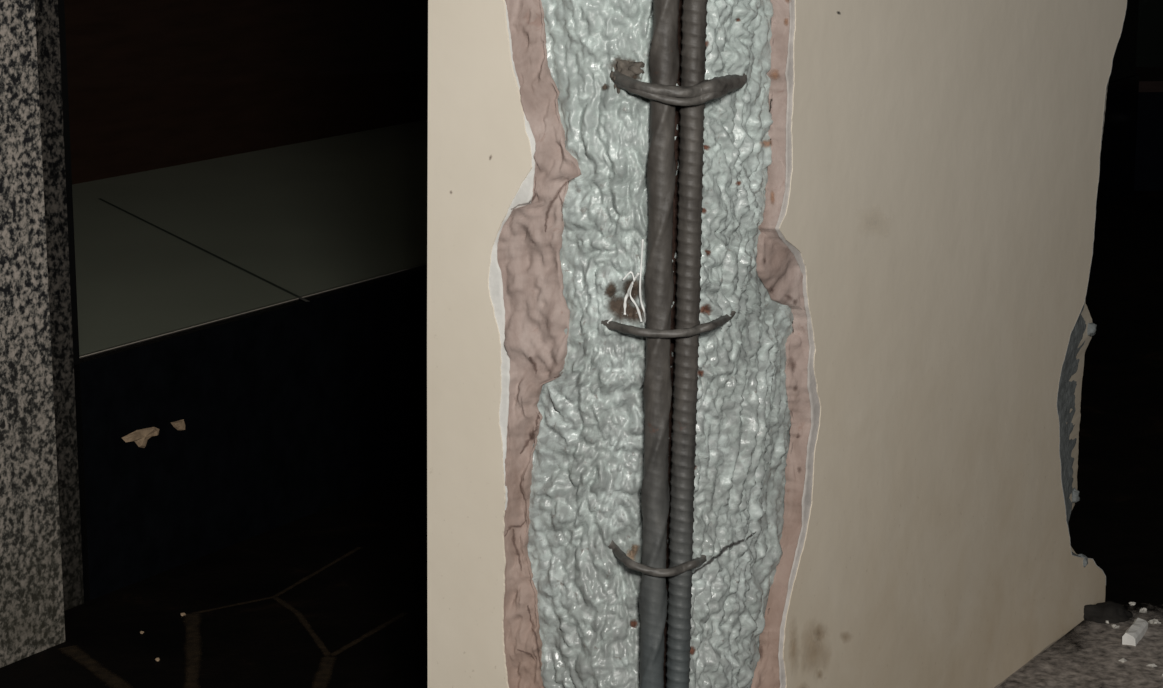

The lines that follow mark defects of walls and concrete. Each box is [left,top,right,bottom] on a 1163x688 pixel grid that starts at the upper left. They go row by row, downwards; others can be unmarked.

corrosion [602,58,645,94]
corrosion [605,280,644,321]
spalling [489,0,820,688]
spalling [1056,3,1127,577]